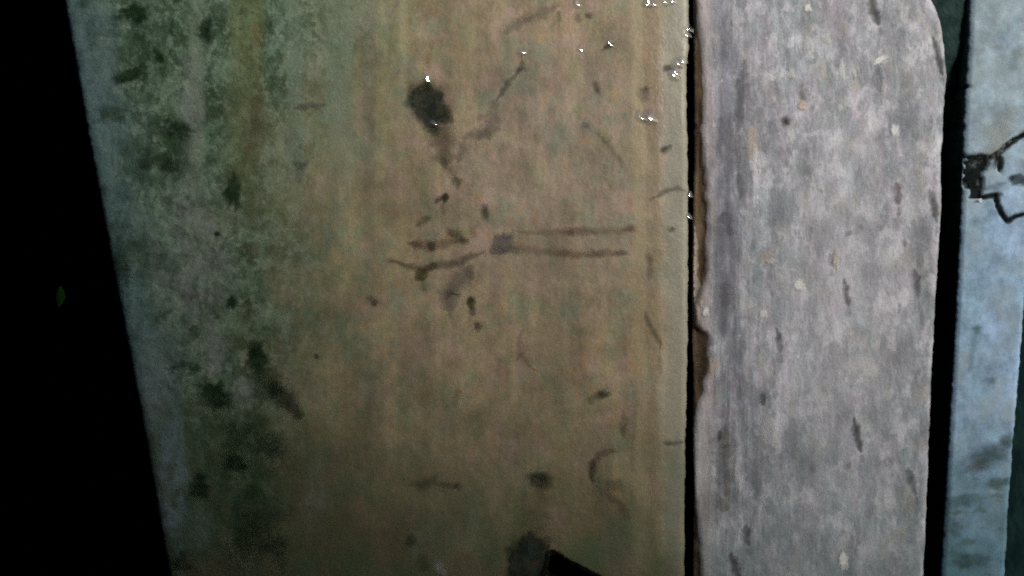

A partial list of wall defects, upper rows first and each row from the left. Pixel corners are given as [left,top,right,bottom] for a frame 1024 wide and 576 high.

leakage [409,84,450,132]
crack [967,133,1024,223]
leakage [248,342,269,370]